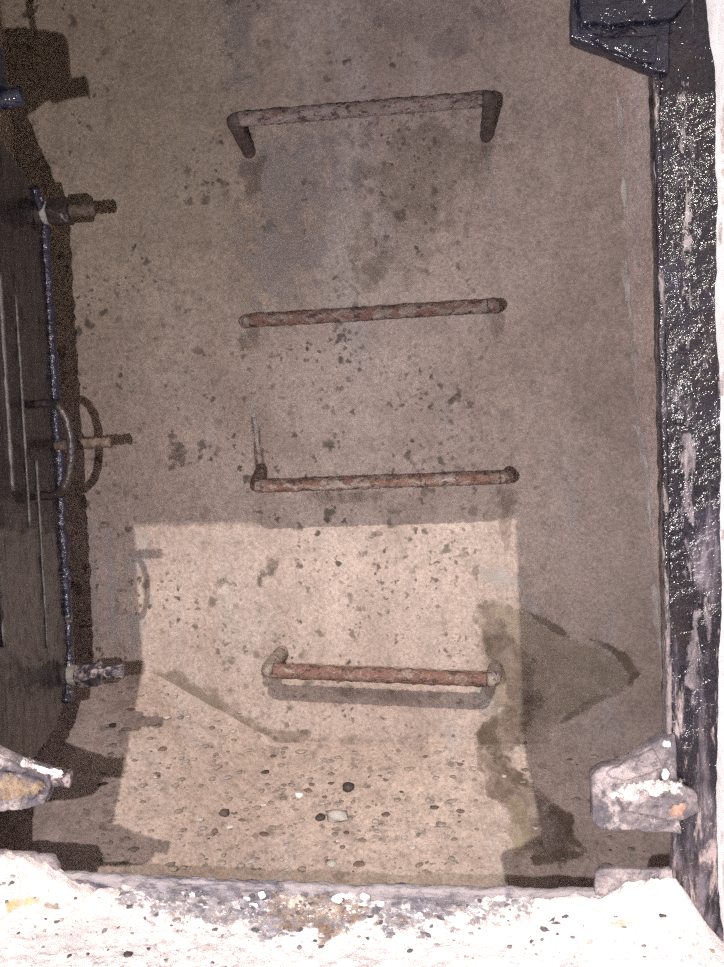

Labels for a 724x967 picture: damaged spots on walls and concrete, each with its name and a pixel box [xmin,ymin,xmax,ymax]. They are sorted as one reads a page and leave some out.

damp [477,597,639,865]